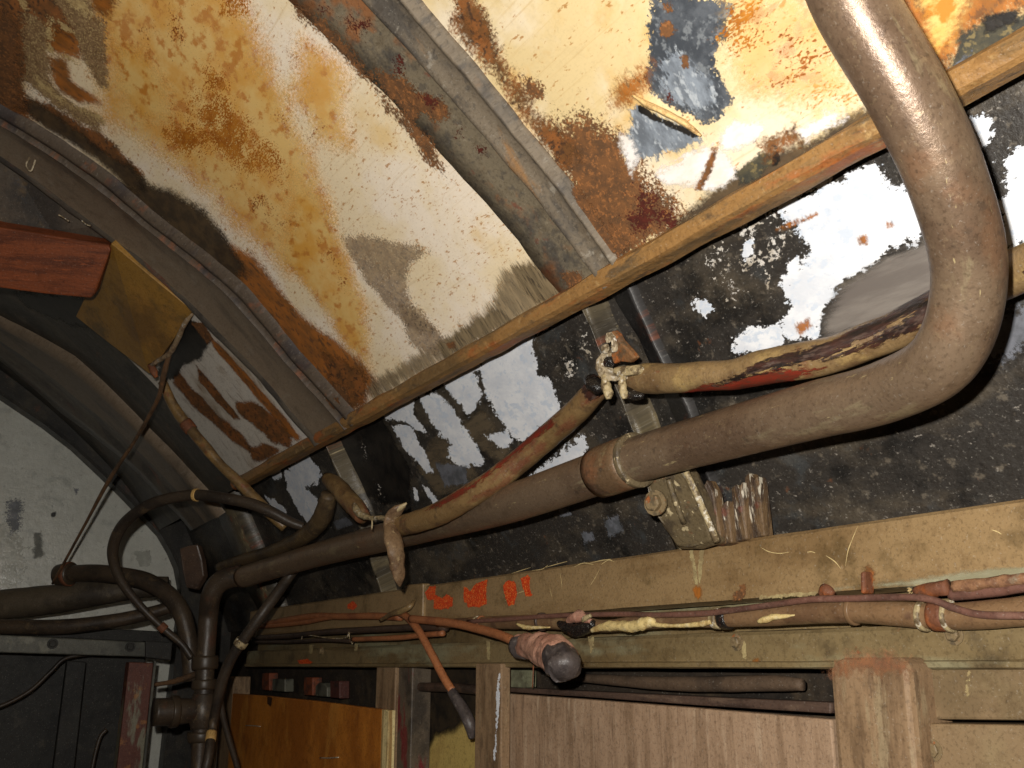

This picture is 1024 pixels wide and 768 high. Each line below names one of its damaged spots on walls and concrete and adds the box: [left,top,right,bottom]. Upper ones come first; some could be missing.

corrosion [448,0,688,258]
peeling [618,0,765,191]
peeling [968,97,996,149]
corrosion [0,0,450,409]
damp [343,234,510,358]
peeling [691,298,715,319]
peeling [705,163,922,355]
peeling [985,303,1024,365]
peeling [992,145,1024,249]
corrosion [173,339,300,462]
peeling [383,327,560,503]
peeling [527,435,589,477]